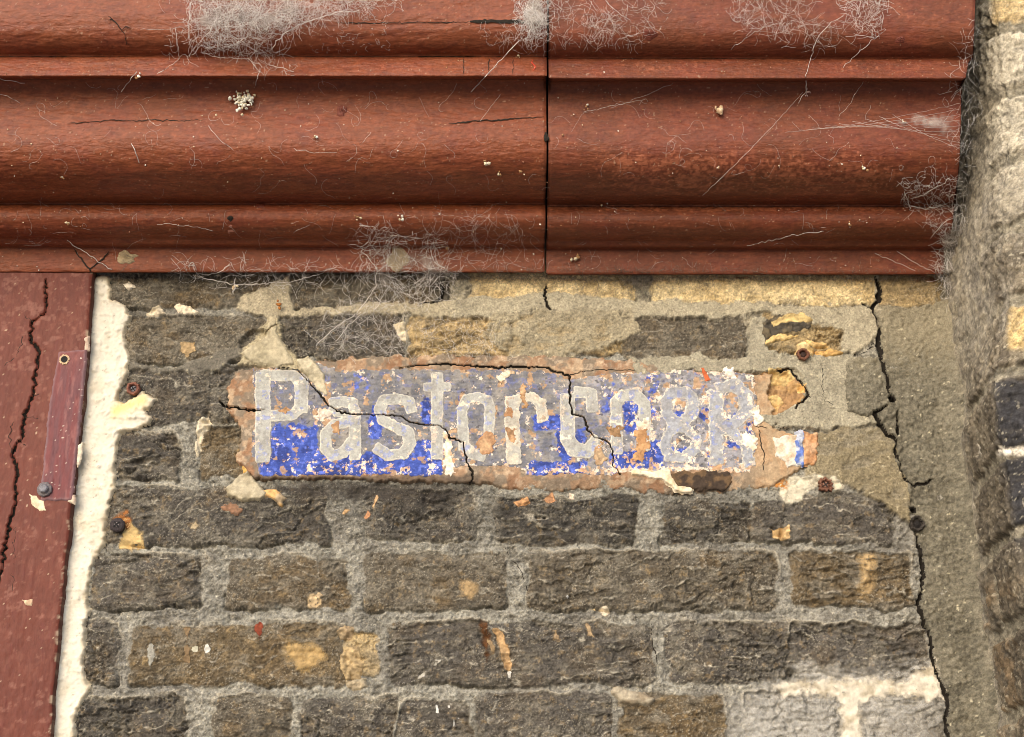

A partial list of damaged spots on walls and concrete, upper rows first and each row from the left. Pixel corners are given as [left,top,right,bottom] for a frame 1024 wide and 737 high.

crack [0,280,48,591]
crack [273,367,474,485]
peeling [442,431,456,476]
peeling [476,370,529,455]
crack [399,363,631,475]
flaking render [593,417,732,495]
spalling [736,367,807,451]
peeling [794,429,819,468]
rust [775,474,844,504]
crack [854,276,932,488]
spalling [487,628,512,671]
crack [915,536,950,737]